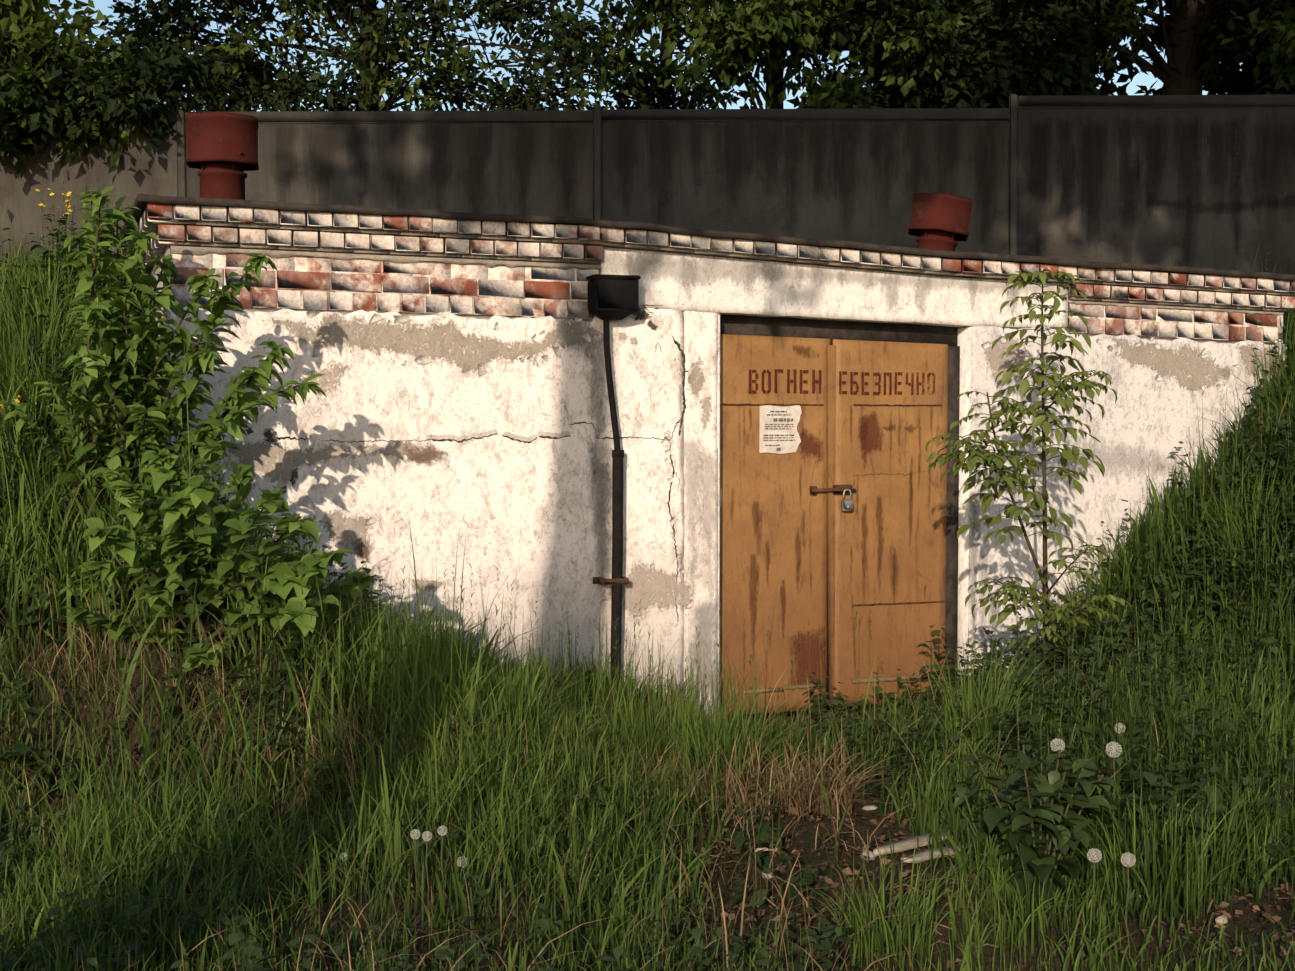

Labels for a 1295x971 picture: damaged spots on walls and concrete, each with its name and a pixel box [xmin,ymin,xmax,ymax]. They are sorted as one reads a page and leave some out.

spalling [619,306,657,345]
peeling [272,310,601,400]
peeling [1096,336,1287,391]
peeling [223,427,448,494]
crack [277,304,689,621]
rust [859,413,881,467]
peeling [313,511,376,562]
peeling [411,579,441,592]
peeling [599,563,694,620]
rust [793,629,826,687]